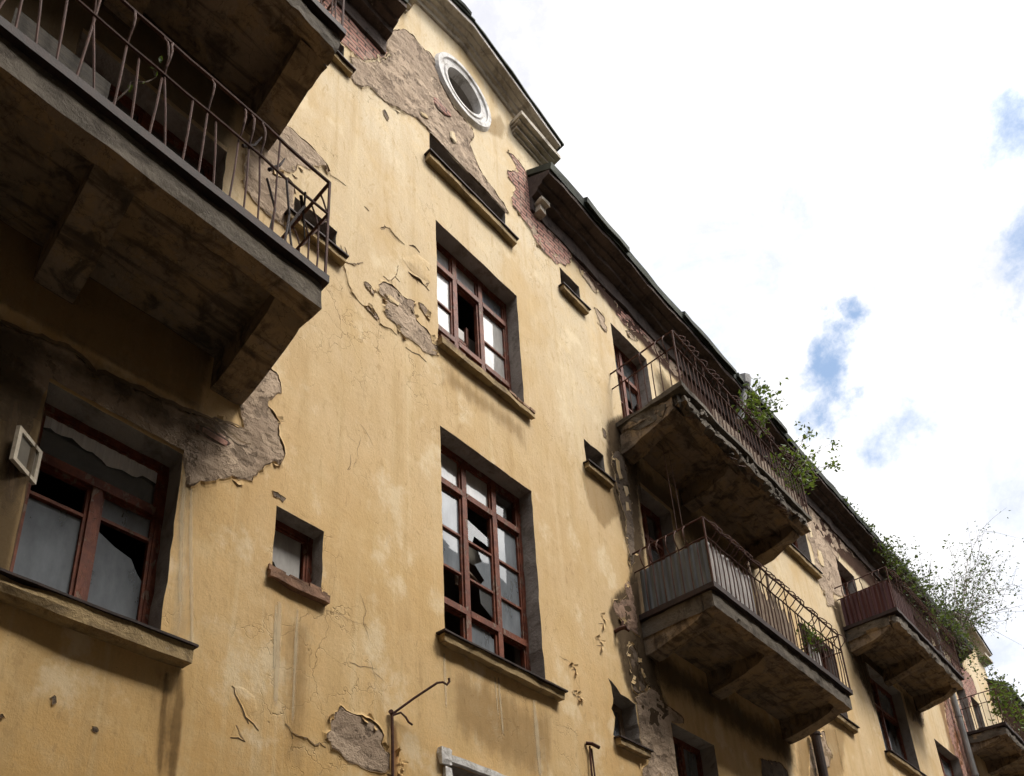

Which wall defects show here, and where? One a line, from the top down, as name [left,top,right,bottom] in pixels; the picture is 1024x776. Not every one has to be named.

peeling [239,126,332,234]
peeling [318,0,684,377]
crack [340,206,430,362]
peeling [0,319,287,491]
peeling [802,502,876,608]
peeling [595,451,684,776]
water stain [159,672,182,776]
crack [230,685,259,742]
crack [285,723,326,749]
peeling [322,702,409,776]